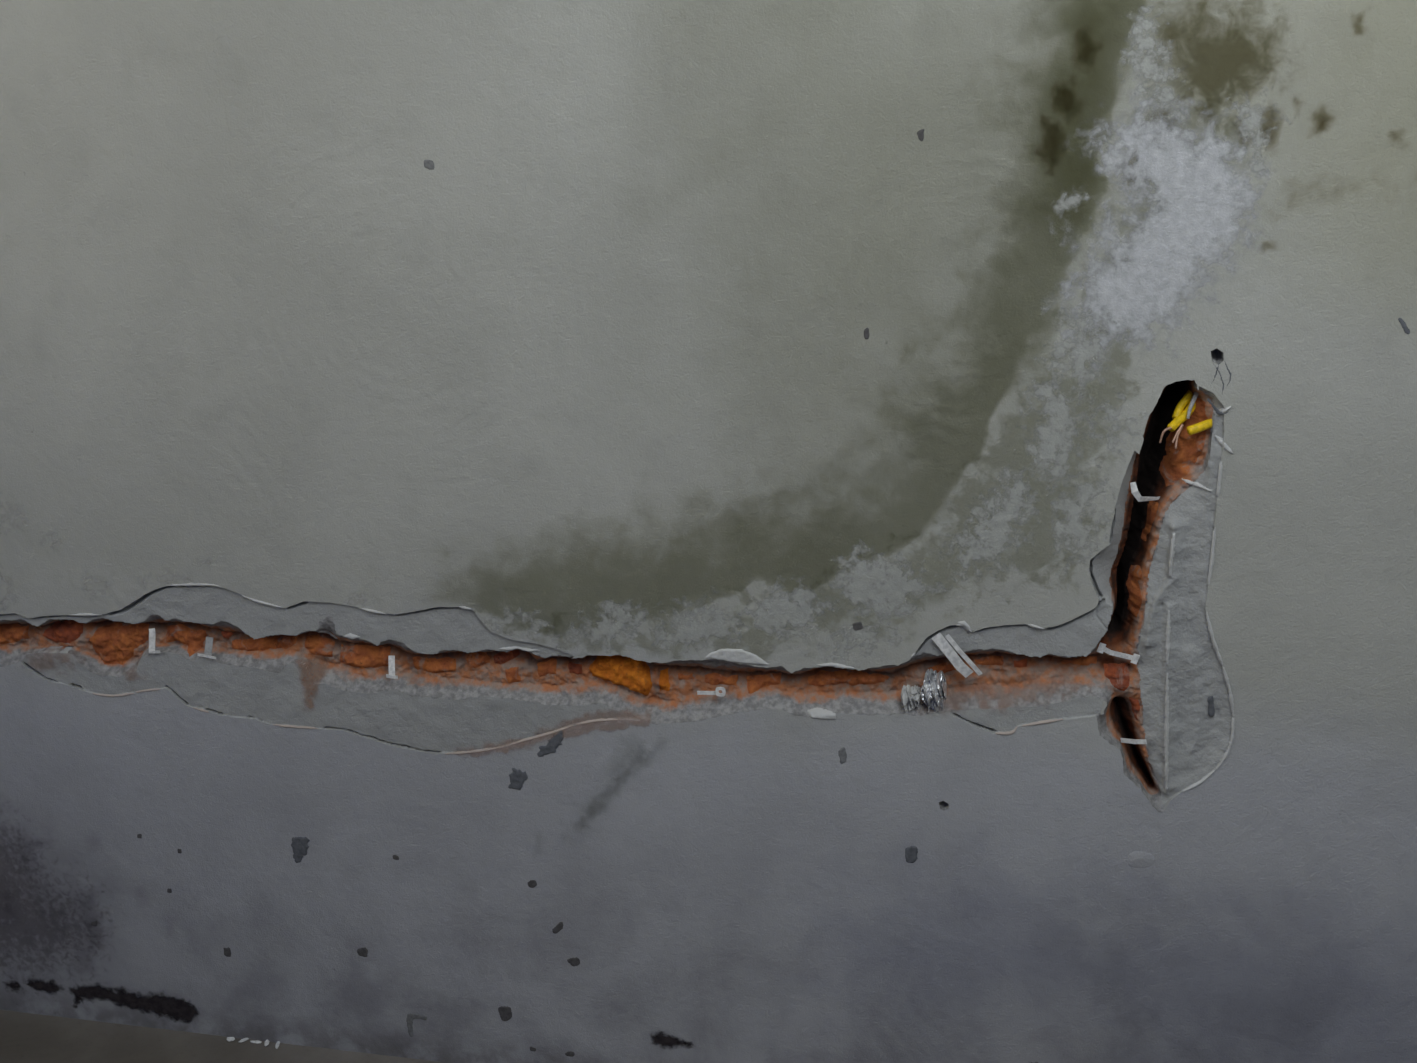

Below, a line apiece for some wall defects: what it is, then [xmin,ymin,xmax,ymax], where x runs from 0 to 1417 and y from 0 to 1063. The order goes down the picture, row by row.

water stain [489,7,1269,661]
flaking render [0,583,782,696]
flaking render [537,730,564,757]
peeling [807,707,836,720]
flaking render [808,662,889,686]
flaking render [911,386,1235,811]